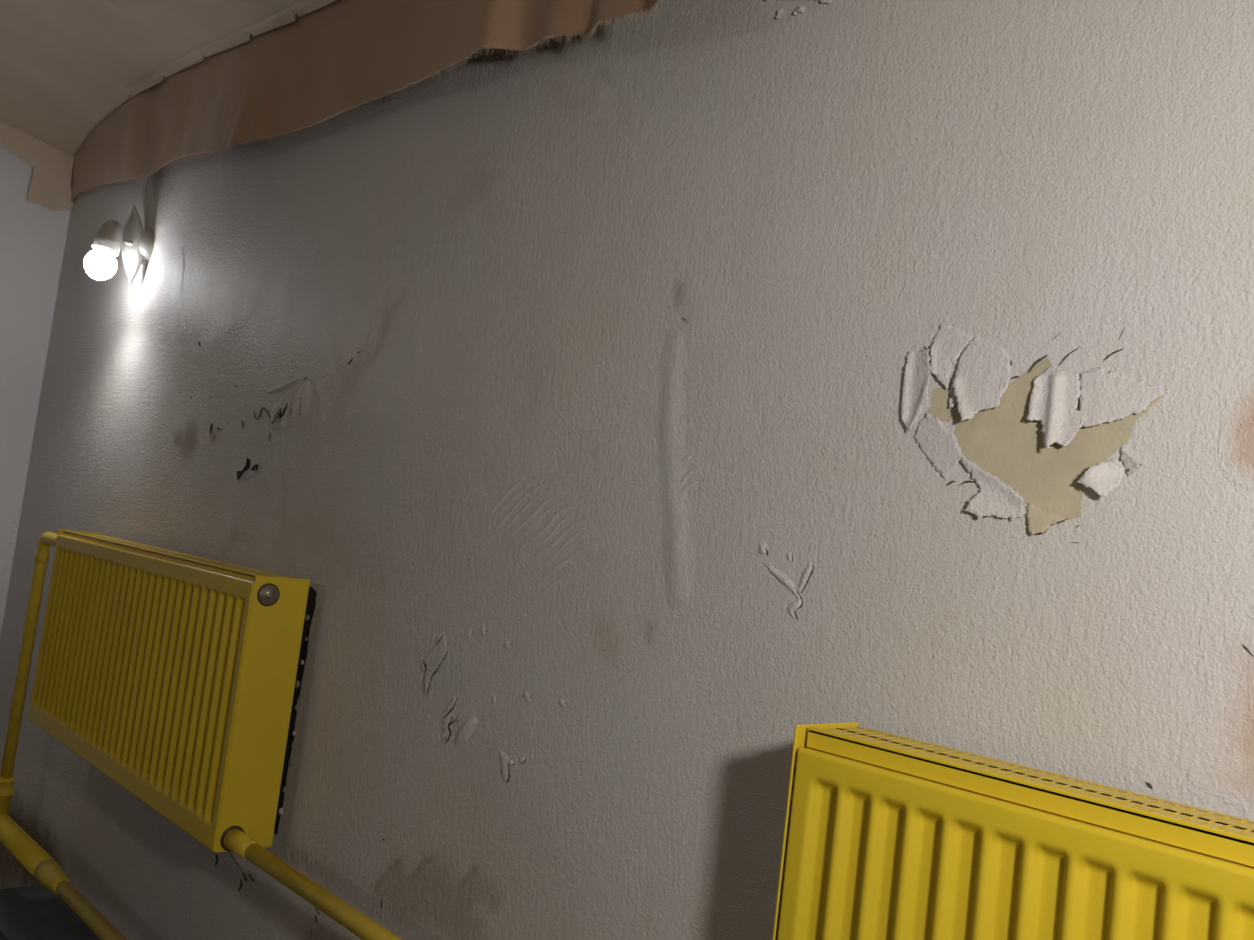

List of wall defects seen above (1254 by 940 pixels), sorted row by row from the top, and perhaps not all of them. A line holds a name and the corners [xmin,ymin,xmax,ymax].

peeling [236,458,258,483]
peeling [241,377,312,440]
peeling [900,322,1170,543]
rust [1218,375,1254,489]
rust [1179,619,1254,821]